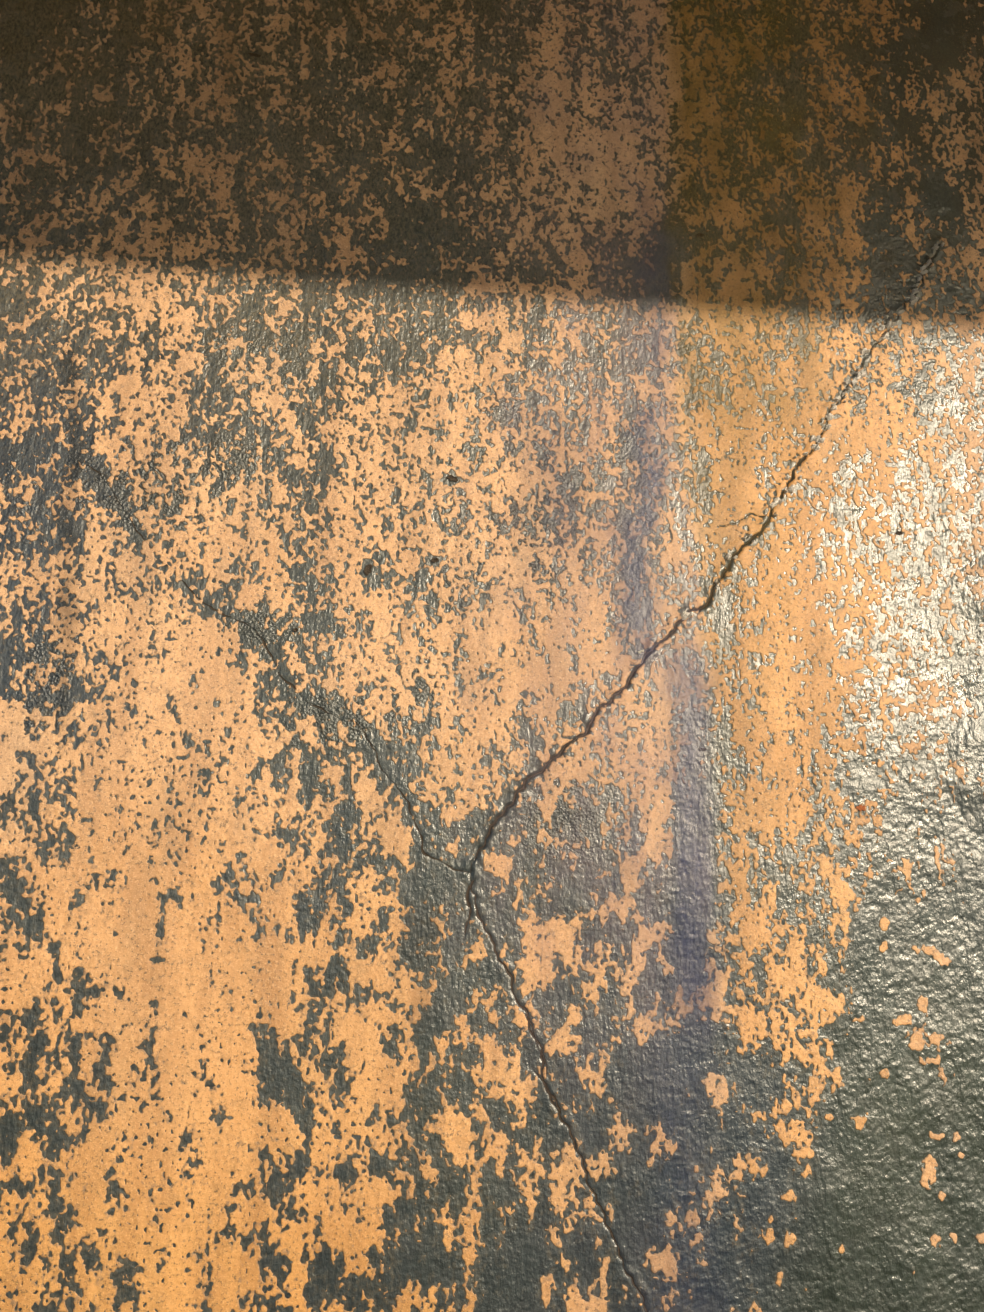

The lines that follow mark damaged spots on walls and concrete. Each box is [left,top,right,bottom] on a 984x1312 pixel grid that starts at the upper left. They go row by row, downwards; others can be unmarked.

crack [83,242,945,1312]
peeling [483,847,515,897]
peeling [456,920,488,971]
peeling [892,995,955,1086]
peeling [701,1072,741,1130]
peeling [644,1121,677,1168]
peeling [919,1131,965,1201]
peeling [642,1146,797,1312]
peeling [929,1232,957,1248]
peeling [391,1279,456,1312]
peeling [539,1273,557,1309]
peeling [563,1256,611,1312]